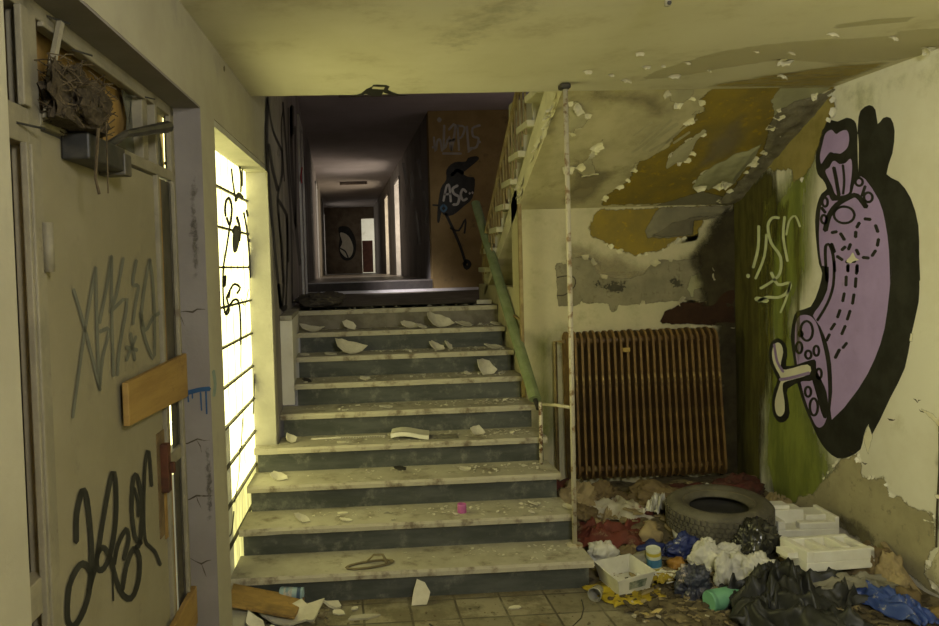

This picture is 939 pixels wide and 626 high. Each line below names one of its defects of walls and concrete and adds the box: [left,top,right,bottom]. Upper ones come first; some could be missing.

peeling [555,52,837,329]
flaking render [794,426,939,596]